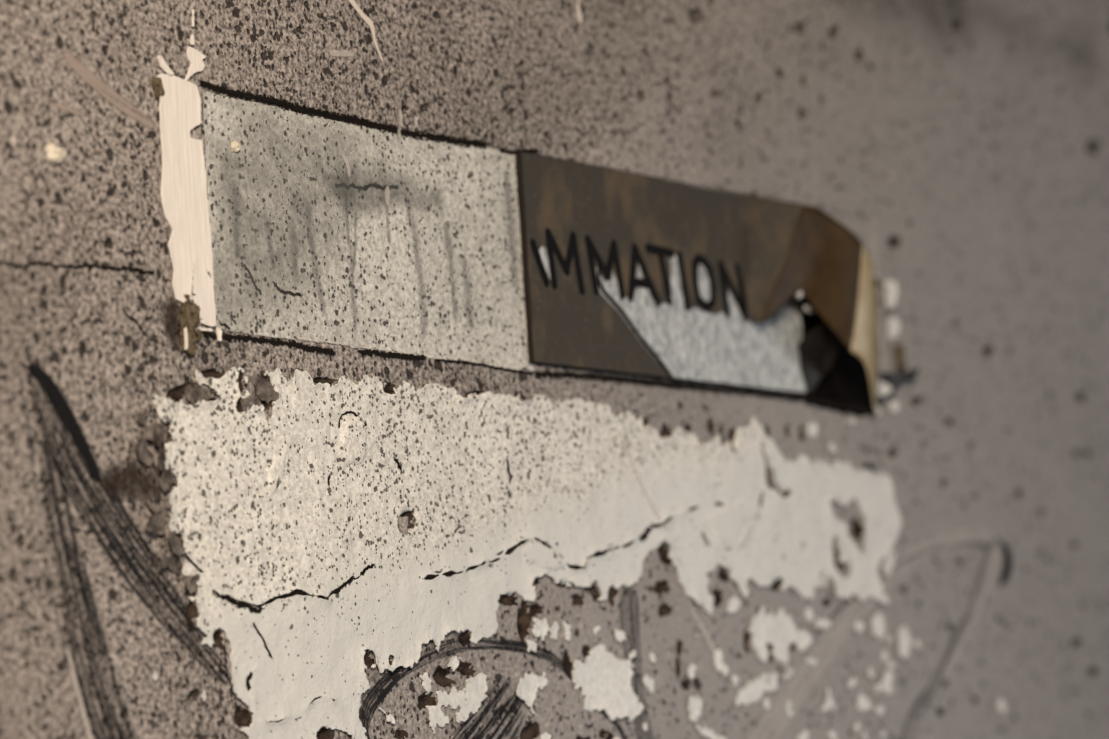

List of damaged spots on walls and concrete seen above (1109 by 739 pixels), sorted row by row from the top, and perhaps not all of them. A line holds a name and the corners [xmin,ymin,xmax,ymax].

crack [0,260,154,275]
peeling [884,280,901,339]
peeling [136,366,921,739]
crack [426,491,764,580]
crack [184,551,374,691]